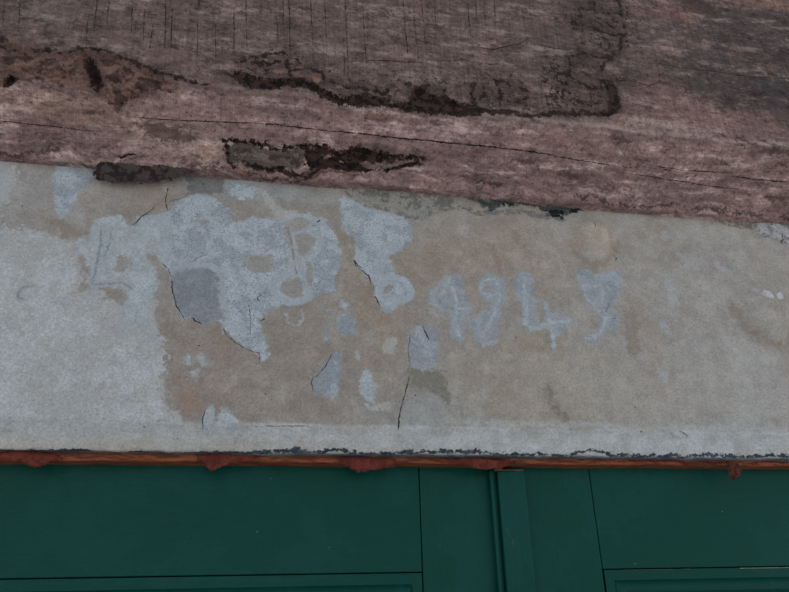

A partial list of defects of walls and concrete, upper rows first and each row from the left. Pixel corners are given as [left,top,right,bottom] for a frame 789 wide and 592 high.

peeling [270,66,345,91]
crack [0,120,98,132]
crack [126,116,786,190]
spalling [708,219,789,248]
peeling [0,161,349,449]